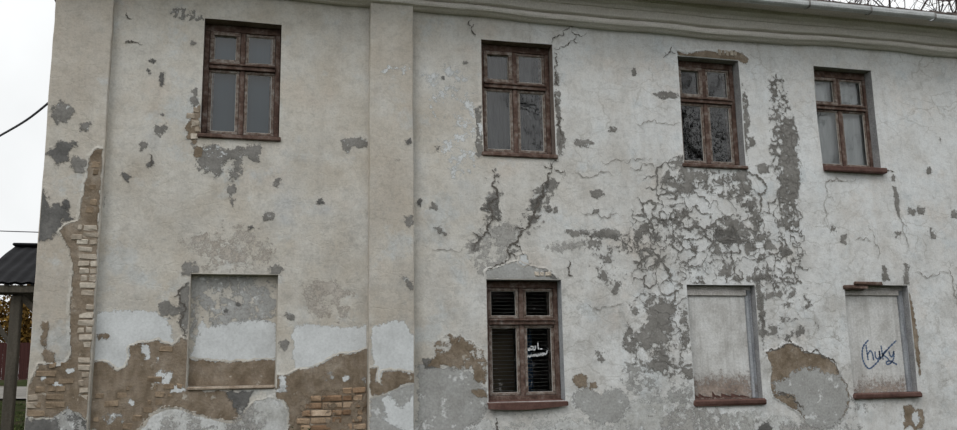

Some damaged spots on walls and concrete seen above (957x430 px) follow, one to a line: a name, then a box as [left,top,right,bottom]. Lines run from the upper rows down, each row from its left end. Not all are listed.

spalling [25,87,488,430]
crack [432,26,856,371]
spalling [570,74,866,430]
spalling [900,402,927,430]